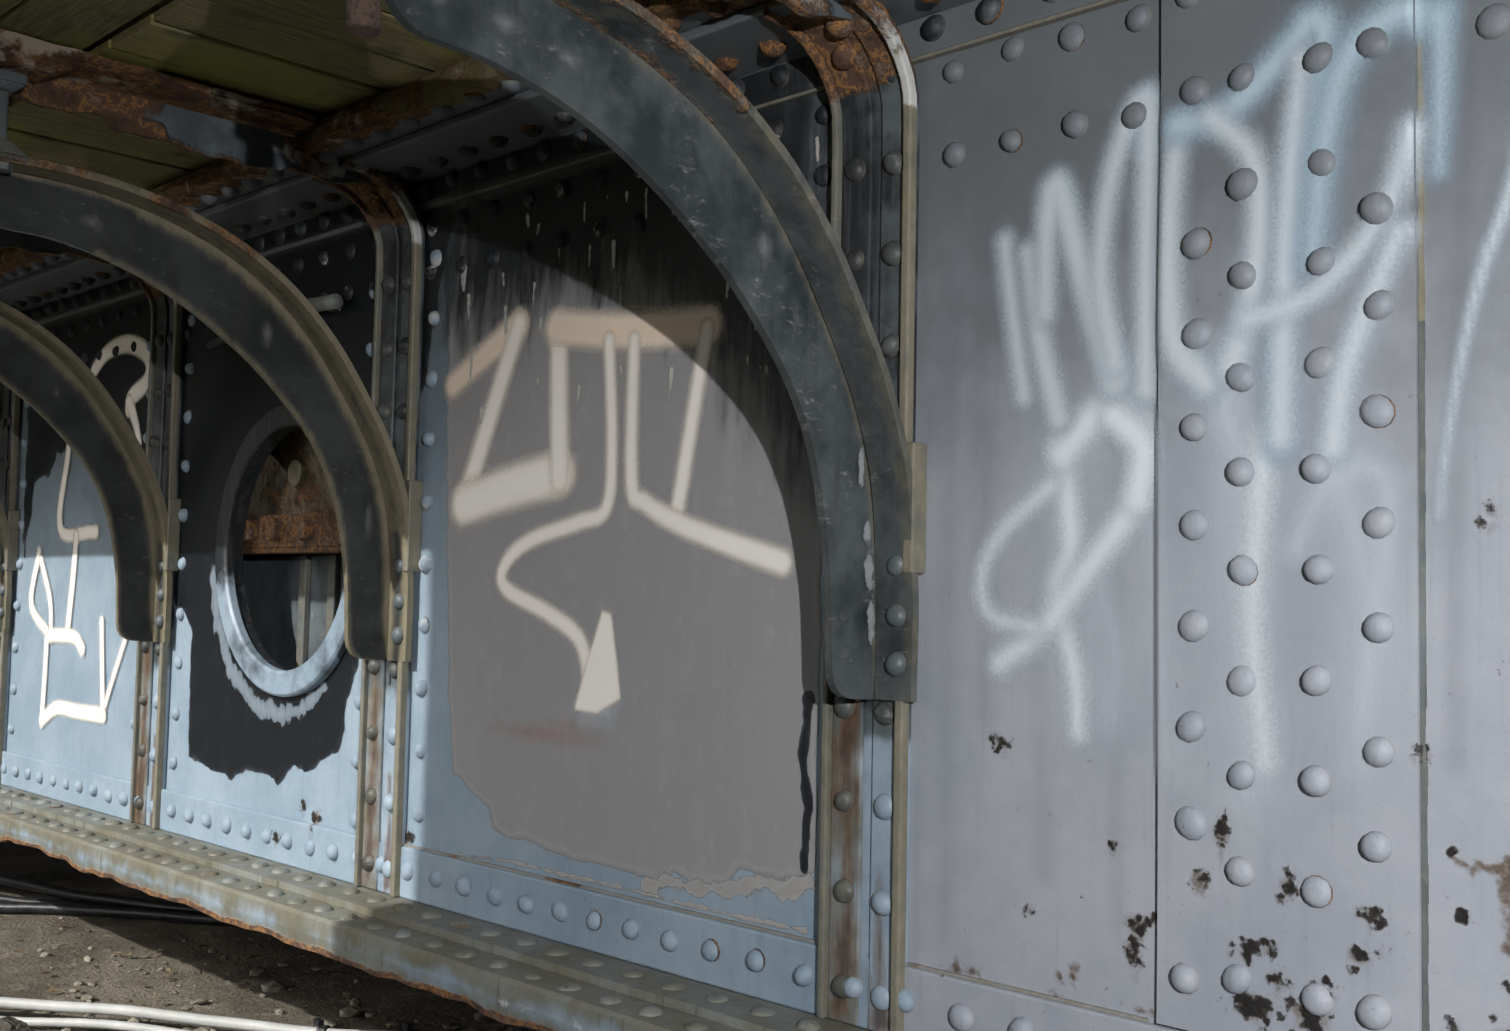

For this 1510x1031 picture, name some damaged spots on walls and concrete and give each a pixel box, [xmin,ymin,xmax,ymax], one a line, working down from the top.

damp [797,691,814,874]
corrosion [834,707,858,856]
corrosion [1214,810,1232,848]
corrosion [835,902,851,976]
corrosion [1123,912,1157,967]
corrosion [1188,868,1211,890]
corrosion [1230,936,1334,1031]
corrosion [1276,866,1299,905]
corrosion [1347,944,1380,974]
corrosion [1357,906,1388,930]
corrosion [1446,846,1510,955]